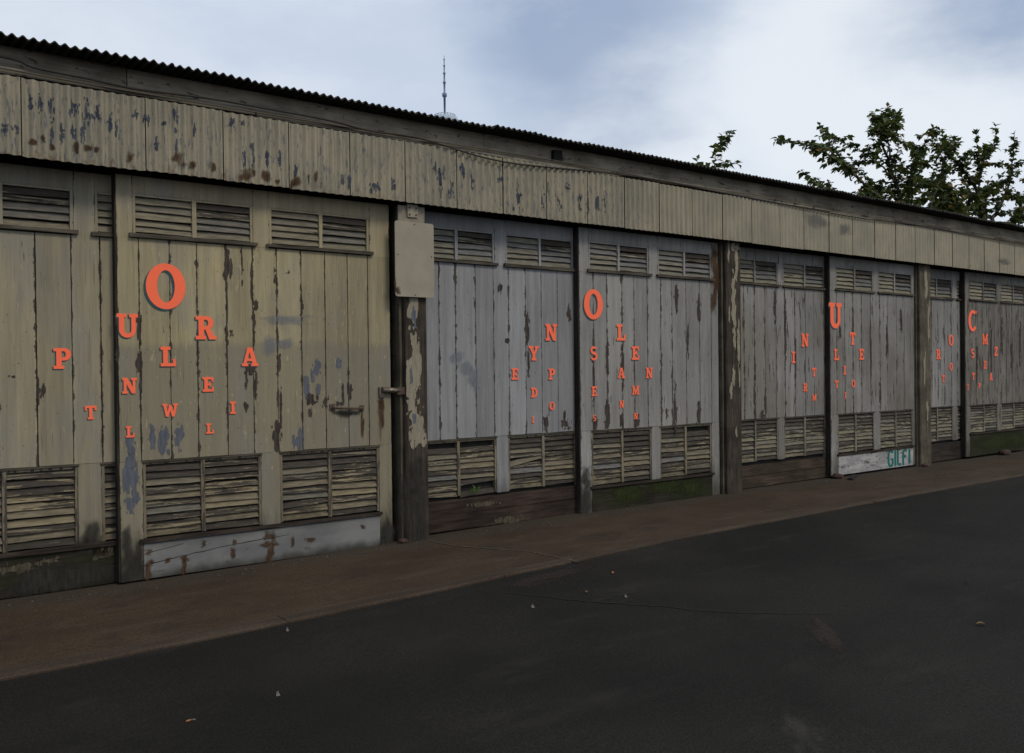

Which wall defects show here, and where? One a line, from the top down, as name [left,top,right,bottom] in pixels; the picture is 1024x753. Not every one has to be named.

peeling [28,93,118,145]
peeling [132,108,179,156]
peeling [242,136,281,172]
corrosion [240,169,318,189]
peeling [727,240,740,399]
peeling [304,359,329,418]
peeling [406,297,427,450]
peeling [149,423,185,455]
peeling [122,432,140,514]
corrosion [144,550,189,581]
corrosion [261,532,278,562]